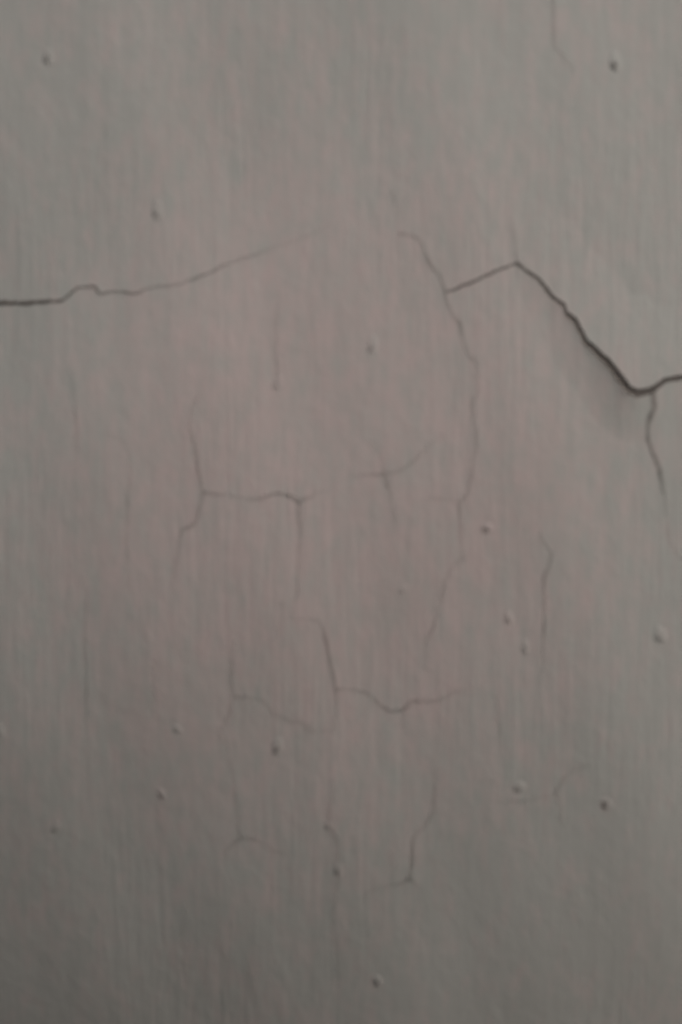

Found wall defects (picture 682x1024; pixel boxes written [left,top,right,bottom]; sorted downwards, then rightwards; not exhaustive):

crack [0,287,96,305]
crack [451,262,682,415]